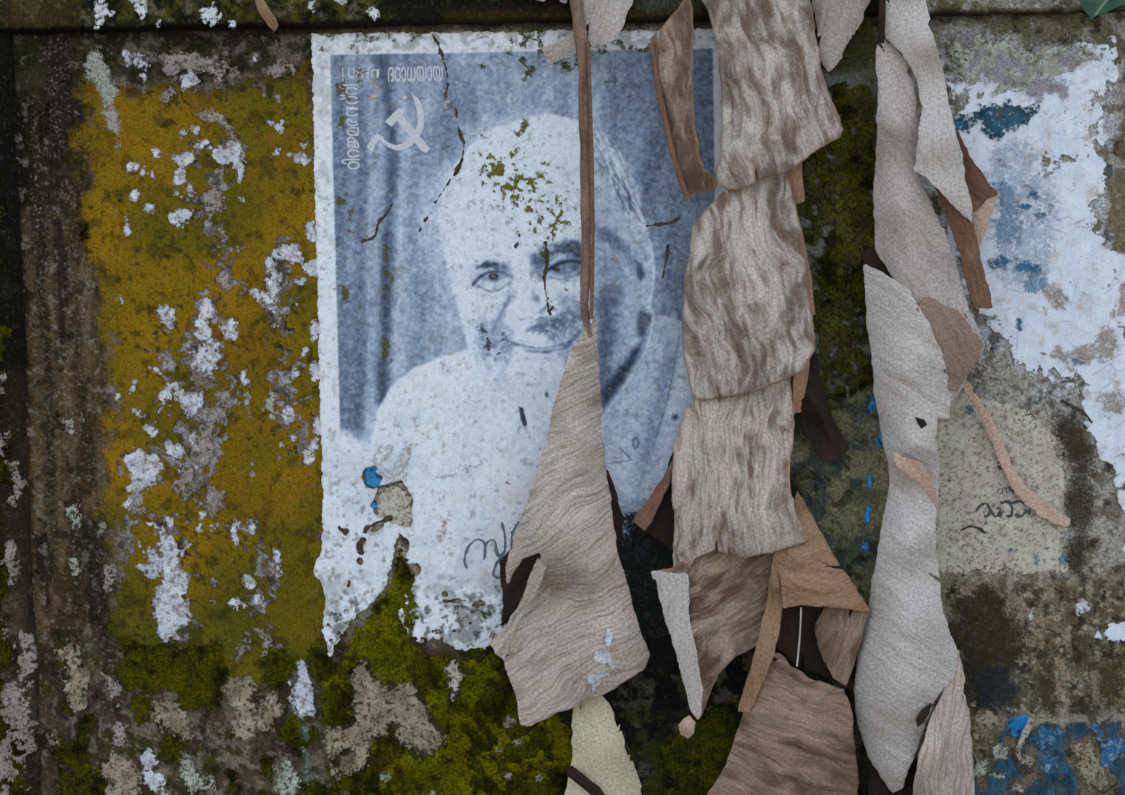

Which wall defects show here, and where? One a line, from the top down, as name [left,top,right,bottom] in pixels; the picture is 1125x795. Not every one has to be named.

spalling [122,49,297,106]
peeling [126,107,318,327]
peeling [945,31,1125,513]
peeling [122,297,321,643]
spalling [101,562,118,593]
peeling [1074,598,1091,616]
peeling [1094,621,1125,642]
damp [300,724,314,785]
peeling [970,708,1125,795]